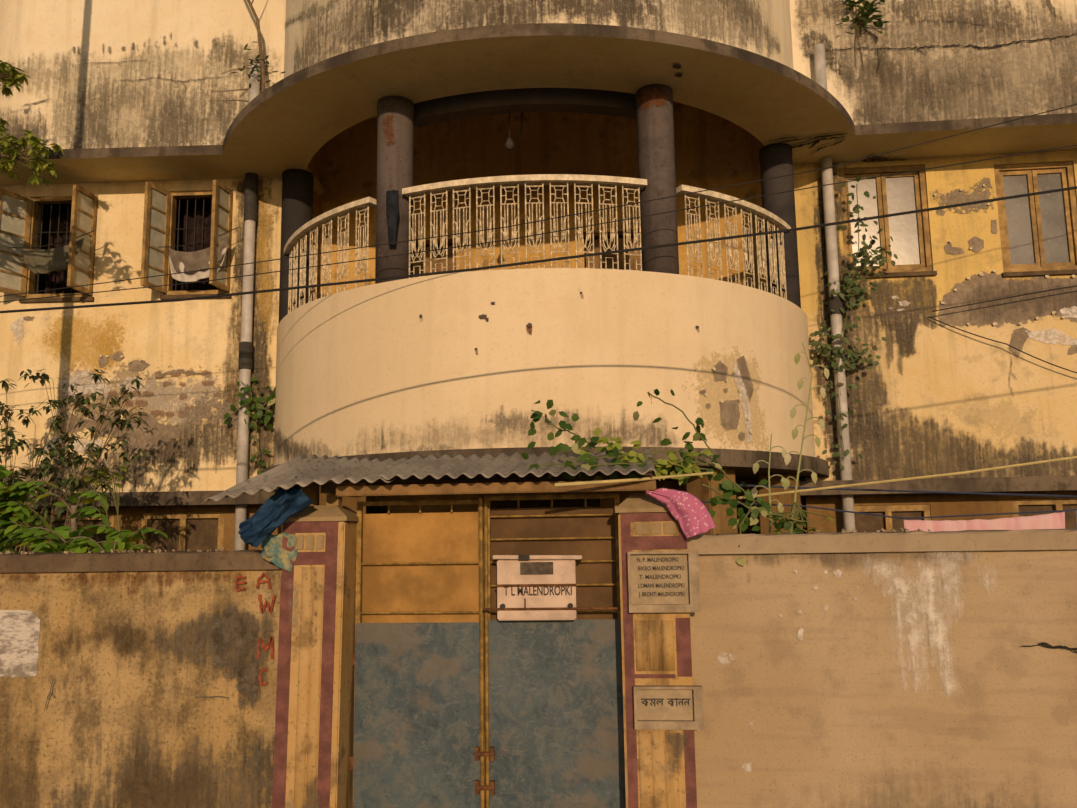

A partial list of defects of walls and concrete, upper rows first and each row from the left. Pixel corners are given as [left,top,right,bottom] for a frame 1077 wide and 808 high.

water stain [0,34,268,150]
water stain [348,0,781,54]
crack [830,19,1077,73]
water stain [877,0,1077,118]
peeling [933,177,997,255]
water stain [814,163,1077,480]
spalling [938,269,1077,358]
spalling [45,350,238,454]
peeling [699,356,754,442]
water stain [92,605,273,709]
efflorescence [873,563,957,693]
crack [1023,642,1077,653]